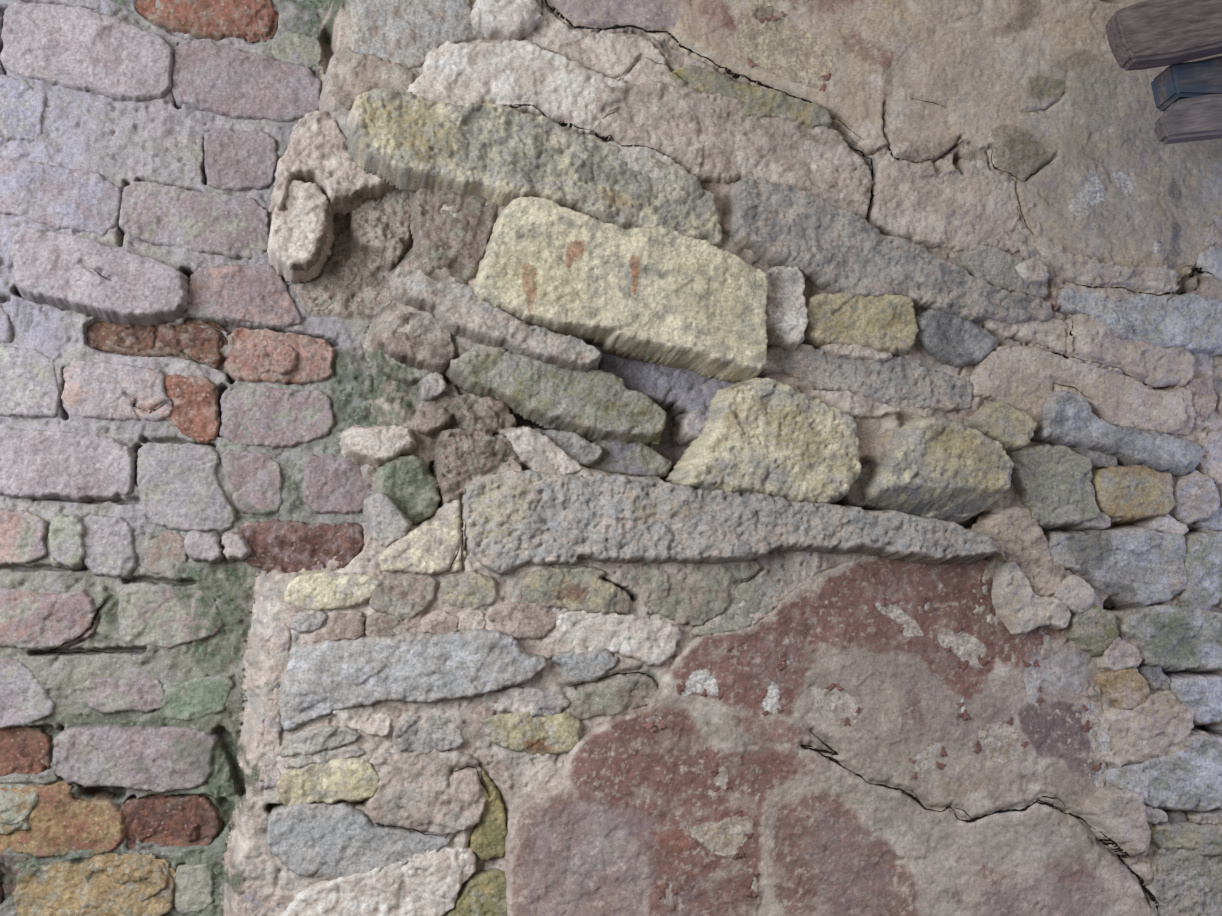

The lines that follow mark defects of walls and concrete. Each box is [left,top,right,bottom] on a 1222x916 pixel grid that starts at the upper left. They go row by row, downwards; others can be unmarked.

crack [503,0,952,217]
crack [800,733,1160,915]